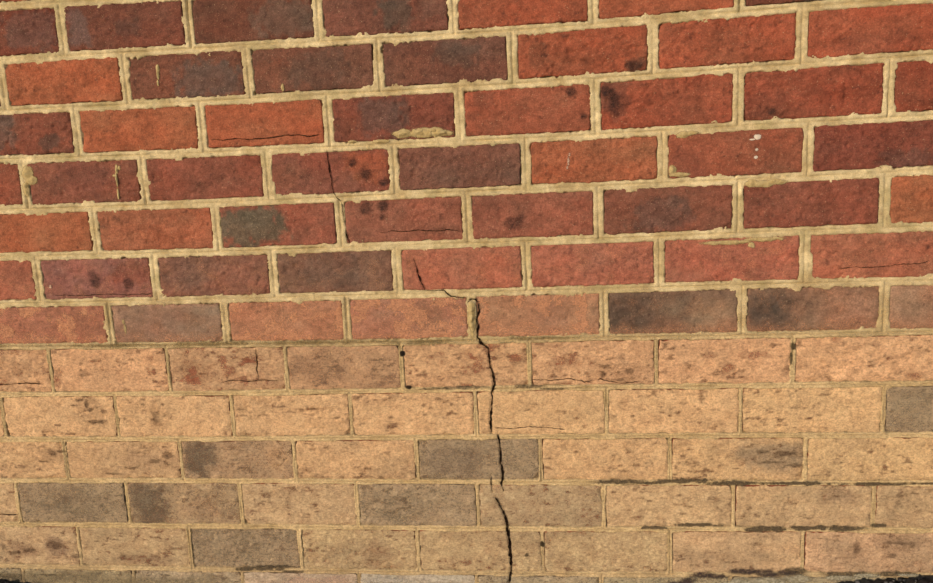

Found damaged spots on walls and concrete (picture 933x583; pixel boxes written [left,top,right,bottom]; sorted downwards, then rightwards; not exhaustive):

crack [382,227,457,235]
crack [414,260,564,583]